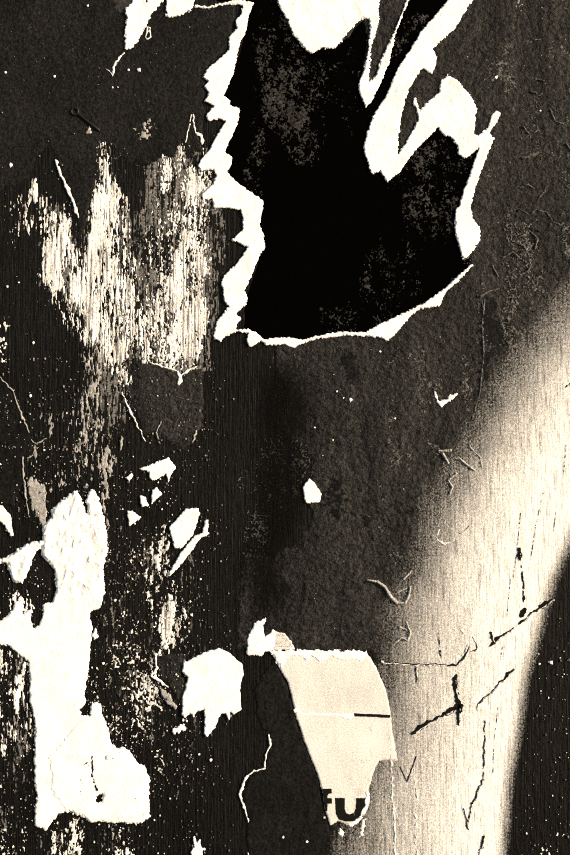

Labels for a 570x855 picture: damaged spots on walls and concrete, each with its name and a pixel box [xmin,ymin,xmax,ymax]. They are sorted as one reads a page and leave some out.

peeling [133,118,152,140]
peeling [0,142,216,855]
crack [372,492,556,855]